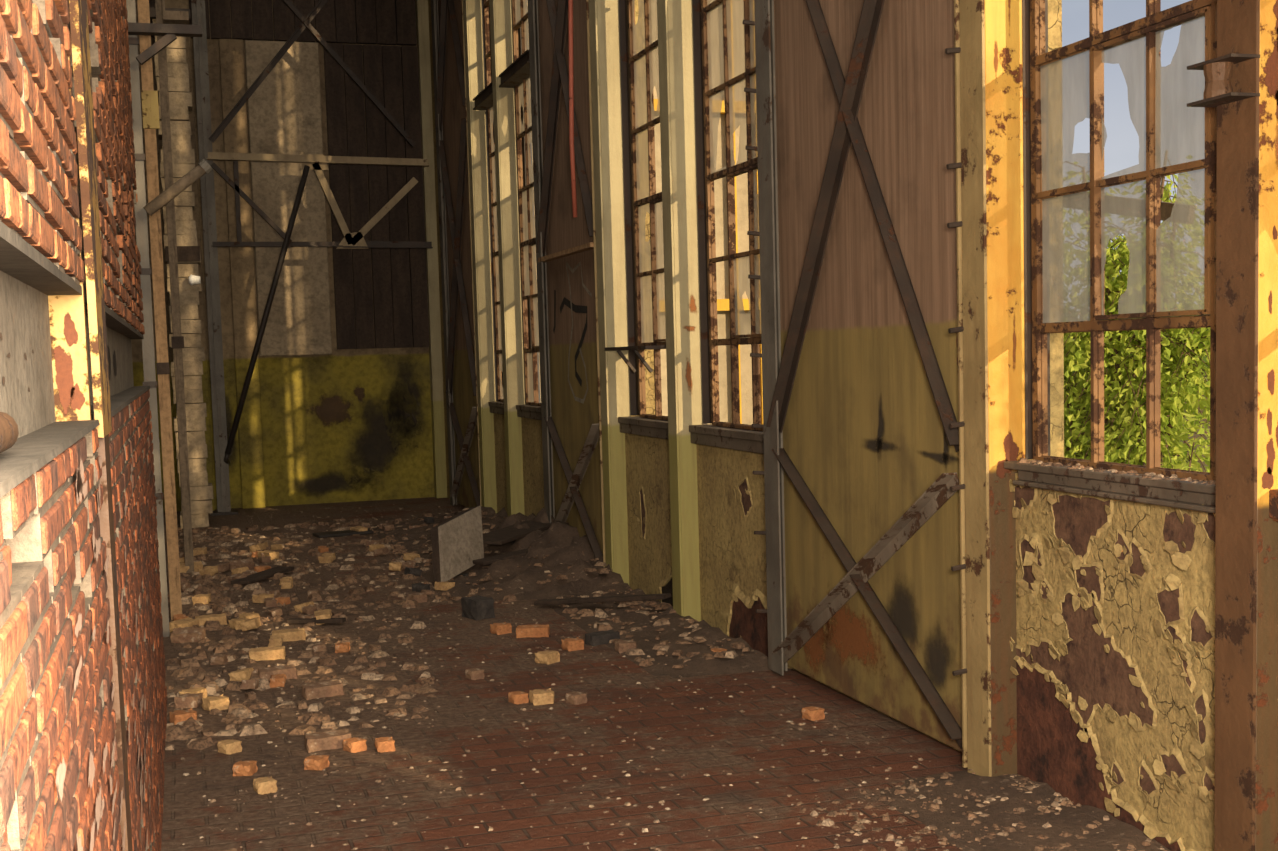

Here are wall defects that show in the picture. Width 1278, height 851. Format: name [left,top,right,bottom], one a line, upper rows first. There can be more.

rust [1263,0,1278,160]
leakage [297,363,423,494]
flaking render [1009,479,1216,851]